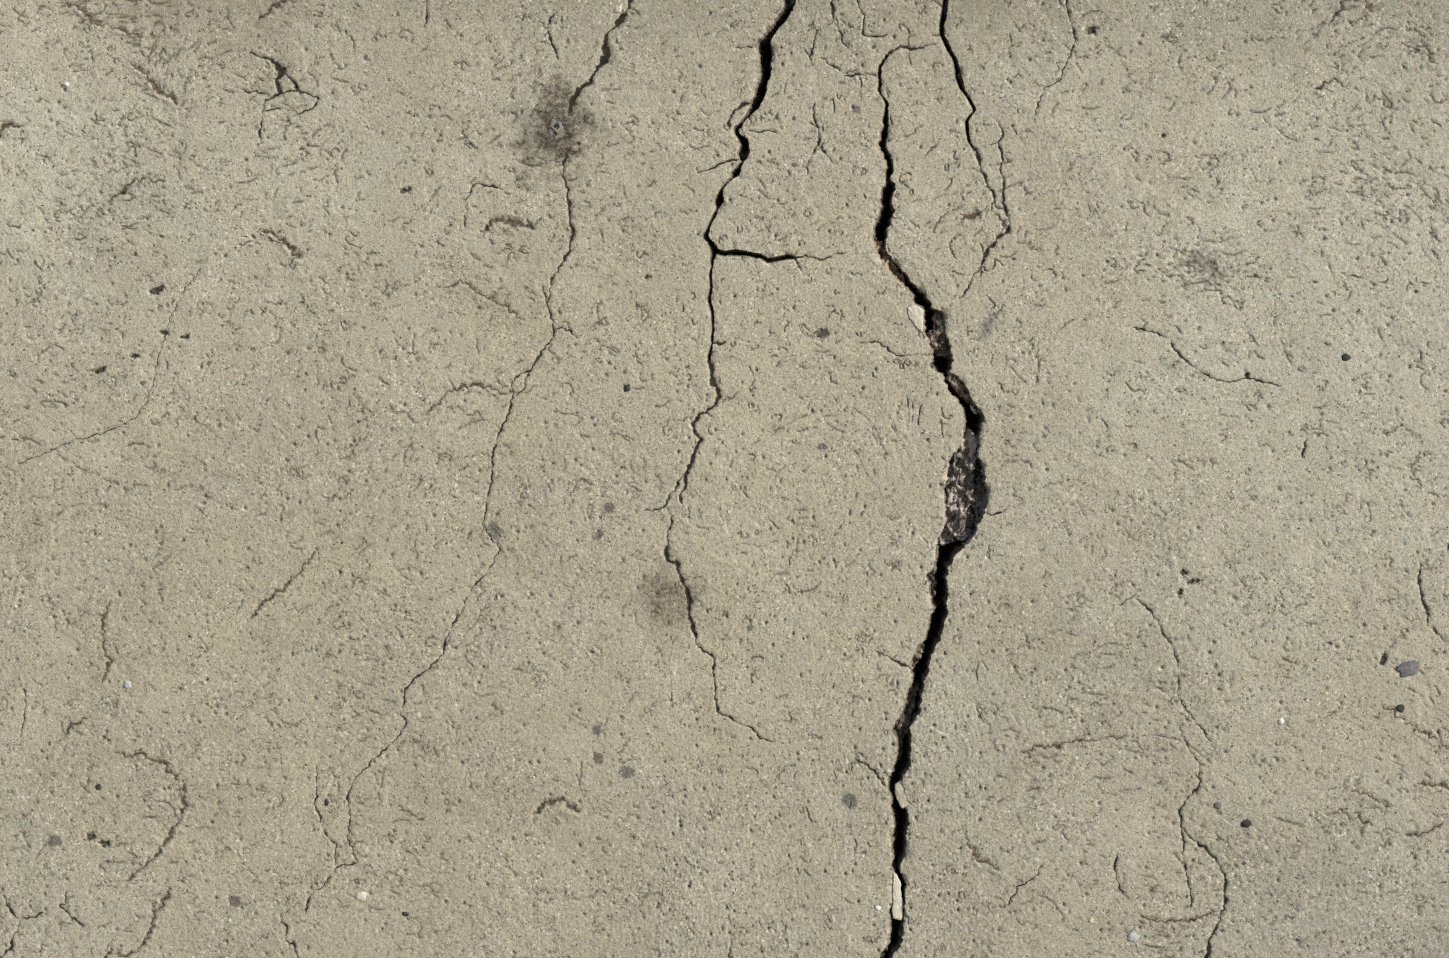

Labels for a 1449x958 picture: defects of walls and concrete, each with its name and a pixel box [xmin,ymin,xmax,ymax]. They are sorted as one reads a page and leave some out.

crack [243,52,319,141]
crack [548,0,632,114]
crack [1035,0,1077,115]
crack [645,0,1011,958]
crack [281,151,578,958]
crack [1118,596,1228,958]
crack [0,893,84,958]
crack [1114,854,1124,894]